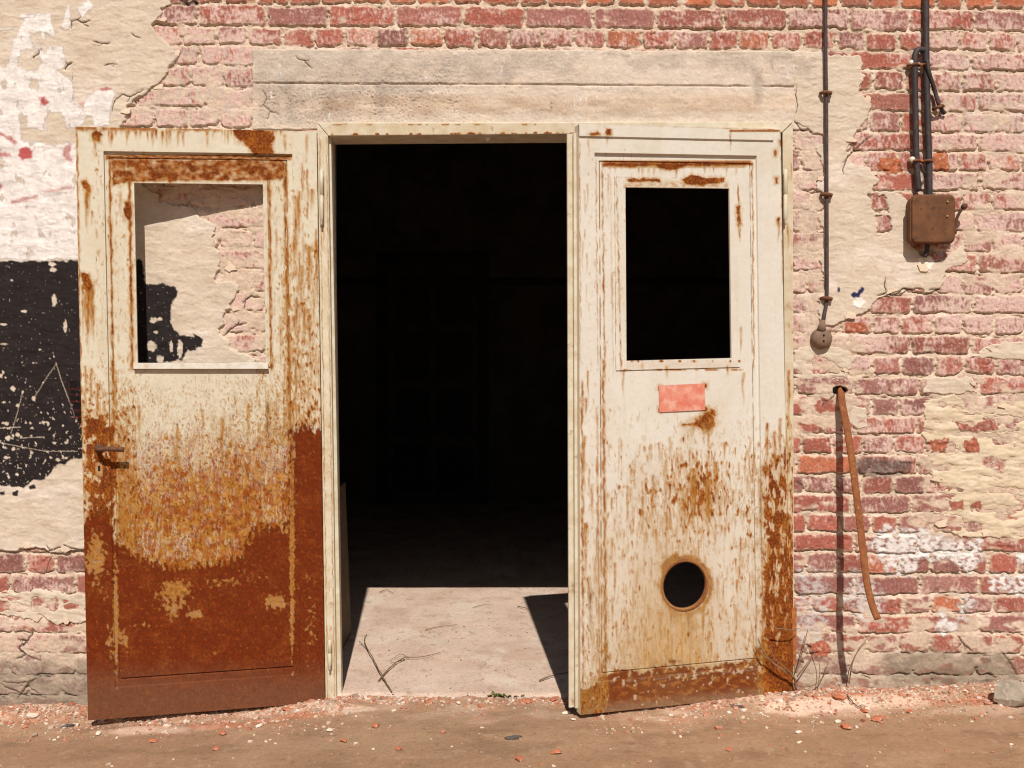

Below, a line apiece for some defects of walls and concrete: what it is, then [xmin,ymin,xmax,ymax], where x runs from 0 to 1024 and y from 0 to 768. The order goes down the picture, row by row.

peeling [0,0,199,554]
peeling [134,183,256,363]
corrosion [75,127,335,720]
corrosion [579,160,793,715]
peeling [793,346,854,394]
peeling [794,54,968,334]
peeling [920,376,1024,540]
peeling [972,341,1024,360]
crack [2,632,41,699]
peeling [0,588,86,626]
leakage [871,523,984,576]
leakage [988,552,1024,597]